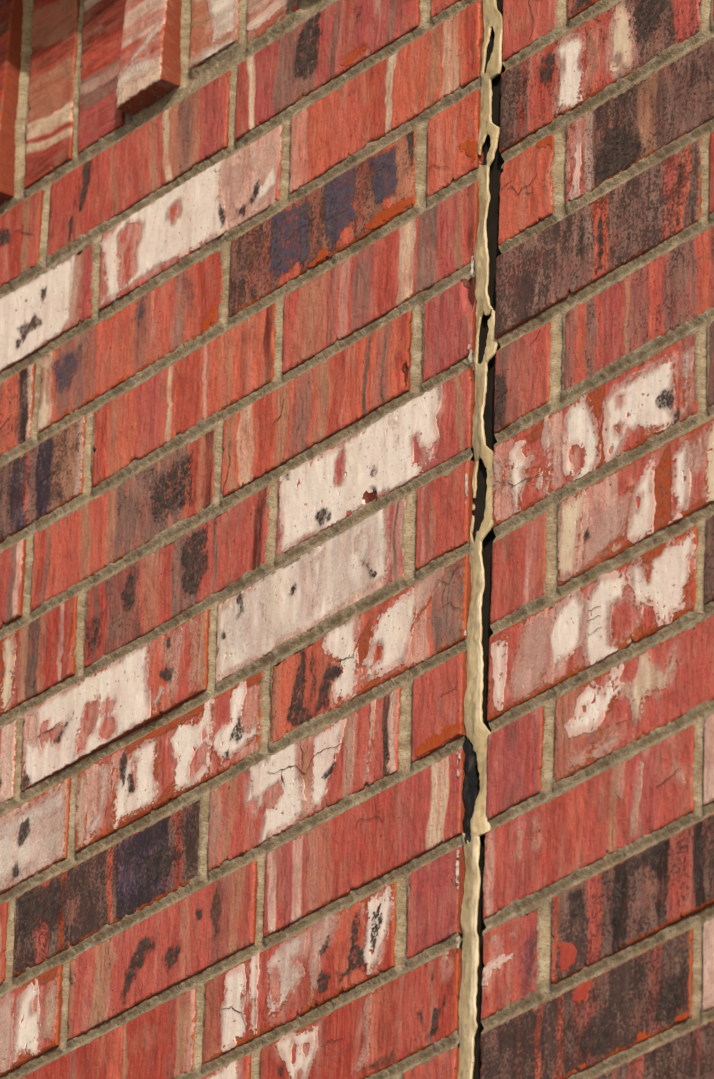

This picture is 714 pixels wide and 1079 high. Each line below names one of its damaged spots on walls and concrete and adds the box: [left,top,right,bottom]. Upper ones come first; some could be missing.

water stain [494,373,508,429]
water stain [655,390,680,424]
water stain [315,508,331,526]
crack [442,0,544,1079]
water stain [287,649,341,726]
water stain [225,719,244,758]
water stain [120,752,134,792]